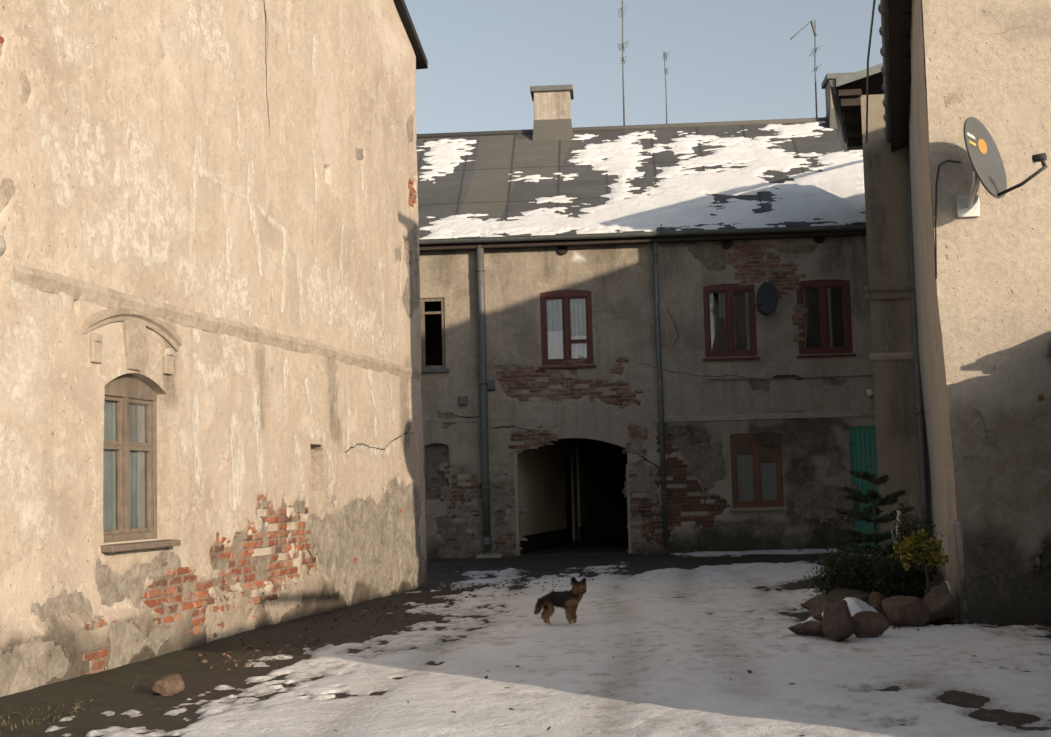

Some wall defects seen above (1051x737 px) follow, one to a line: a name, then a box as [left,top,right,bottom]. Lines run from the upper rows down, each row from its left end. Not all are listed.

crack [263,2,271,138]
peeling [0,178,16,213]
damp [40,92,401,359]
peeling [395,223,420,318]
flaking render [408,170,417,208]
flaking render [683,241,818,299]
flaking render [496,355,645,409]
crack [345,423,414,455]
flaking render [434,462,528,559]
flaking render [626,425,733,547]
damp [957,411,1051,625]
peeling [0,475,425,697]